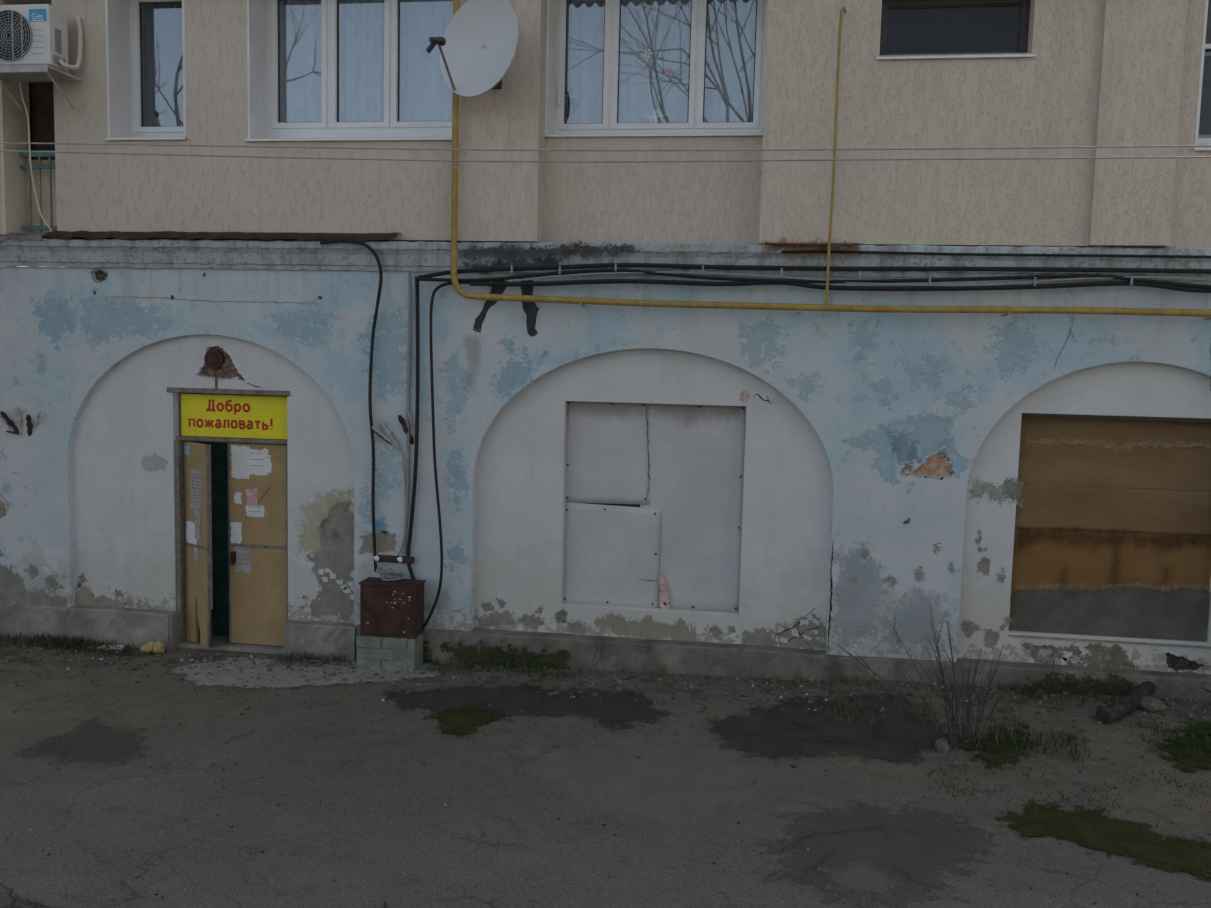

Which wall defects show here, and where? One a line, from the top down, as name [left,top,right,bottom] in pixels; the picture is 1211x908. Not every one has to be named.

peeling [842,414,1026,507]
flaking render [0,495,8,520]
peeling [0,550,156,610]
peeling [299,489,397,621]
peeling [476,598,545,630]
peeling [562,567,826,650]
spalling [1163,650,1210,674]